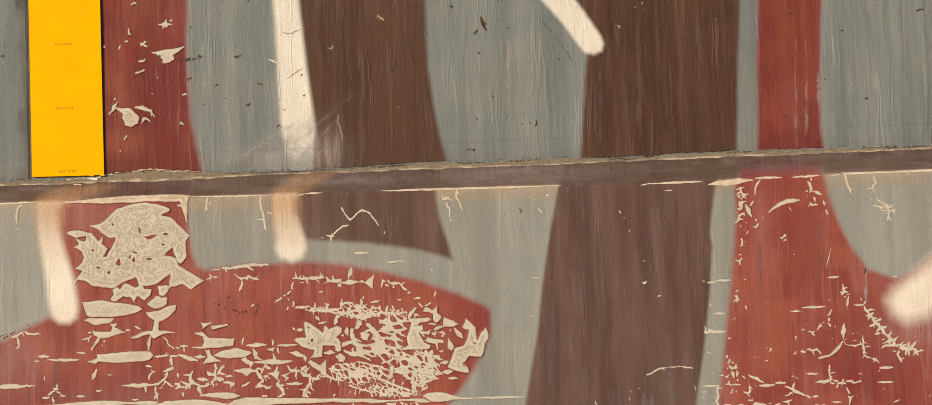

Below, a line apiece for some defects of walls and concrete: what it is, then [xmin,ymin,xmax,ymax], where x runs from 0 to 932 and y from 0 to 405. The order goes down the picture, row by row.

peeling [135,41,202,74]
peeling [108,98,155,152]
peeling [733,181,828,265]
peeling [34,194,343,400]
peeling [274,267,490,381]
peeling [720,355,786,394]
peeling [791,299,862,388]
peeling [827,276,862,309]